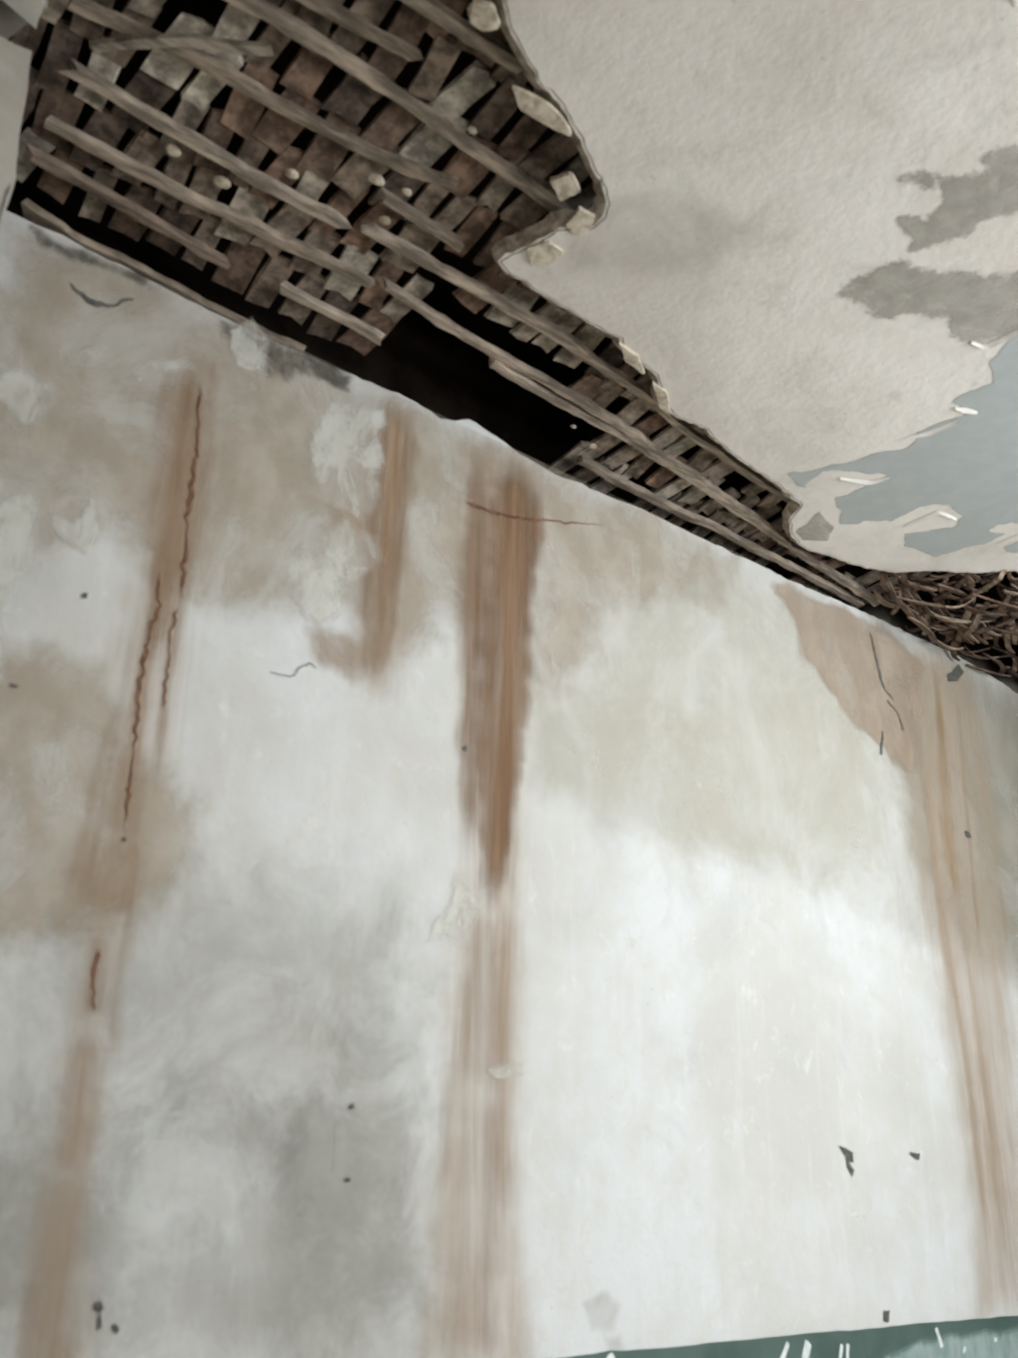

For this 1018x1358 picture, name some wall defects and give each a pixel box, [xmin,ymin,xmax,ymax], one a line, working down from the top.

flaking render [469,0,500,31]
flaking render [512,84,572,137]
flaking render [550,171,595,236]
crack [124,392,202,823]
damp [0,233,434,666]
peeling [289,403,383,622]
damp [385,405,714,669]
flaking render [619,341,670,415]
peeling [789,146,1018,557]
damp [0,658,187,932]
damp [776,585,1018,949]
crack [91,951,101,1008]